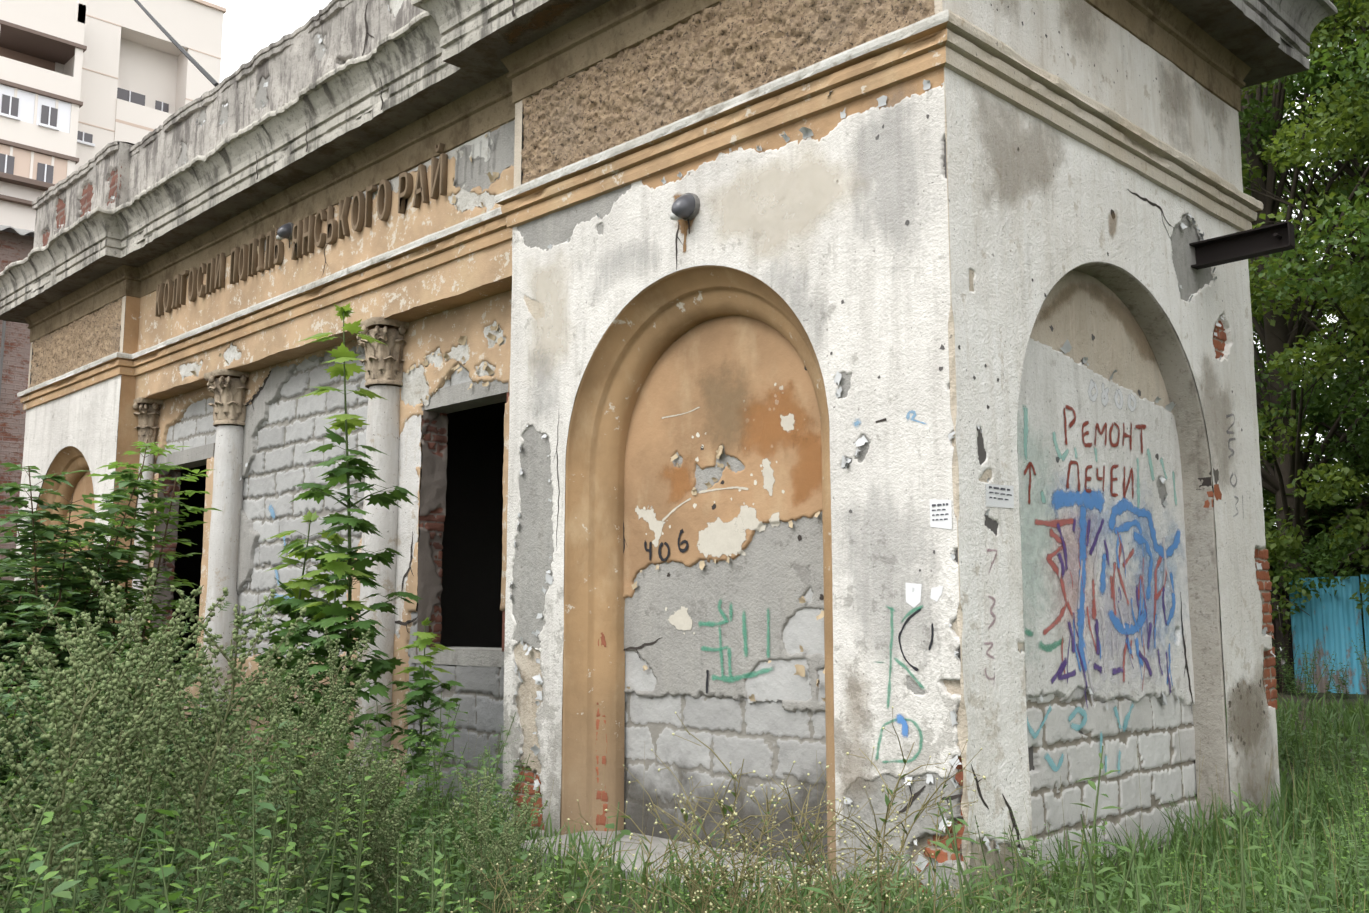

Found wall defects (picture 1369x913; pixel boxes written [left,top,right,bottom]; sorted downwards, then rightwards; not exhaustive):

peeling [338,120,515,214]
peeling [517,68,944,251]
crack [1129,190,1173,239]
spalling [1170,214,1217,302]
flaking render [1213,315,1229,360]
peeling [395,321,506,639]
peeling [841,418,886,469]
peeling [977,424,992,483]
spalling [508,425,554,830]
spalling [595,432,827,831]
flaking render [1229,548,1285,754]
spalling [839,680,1198,909]